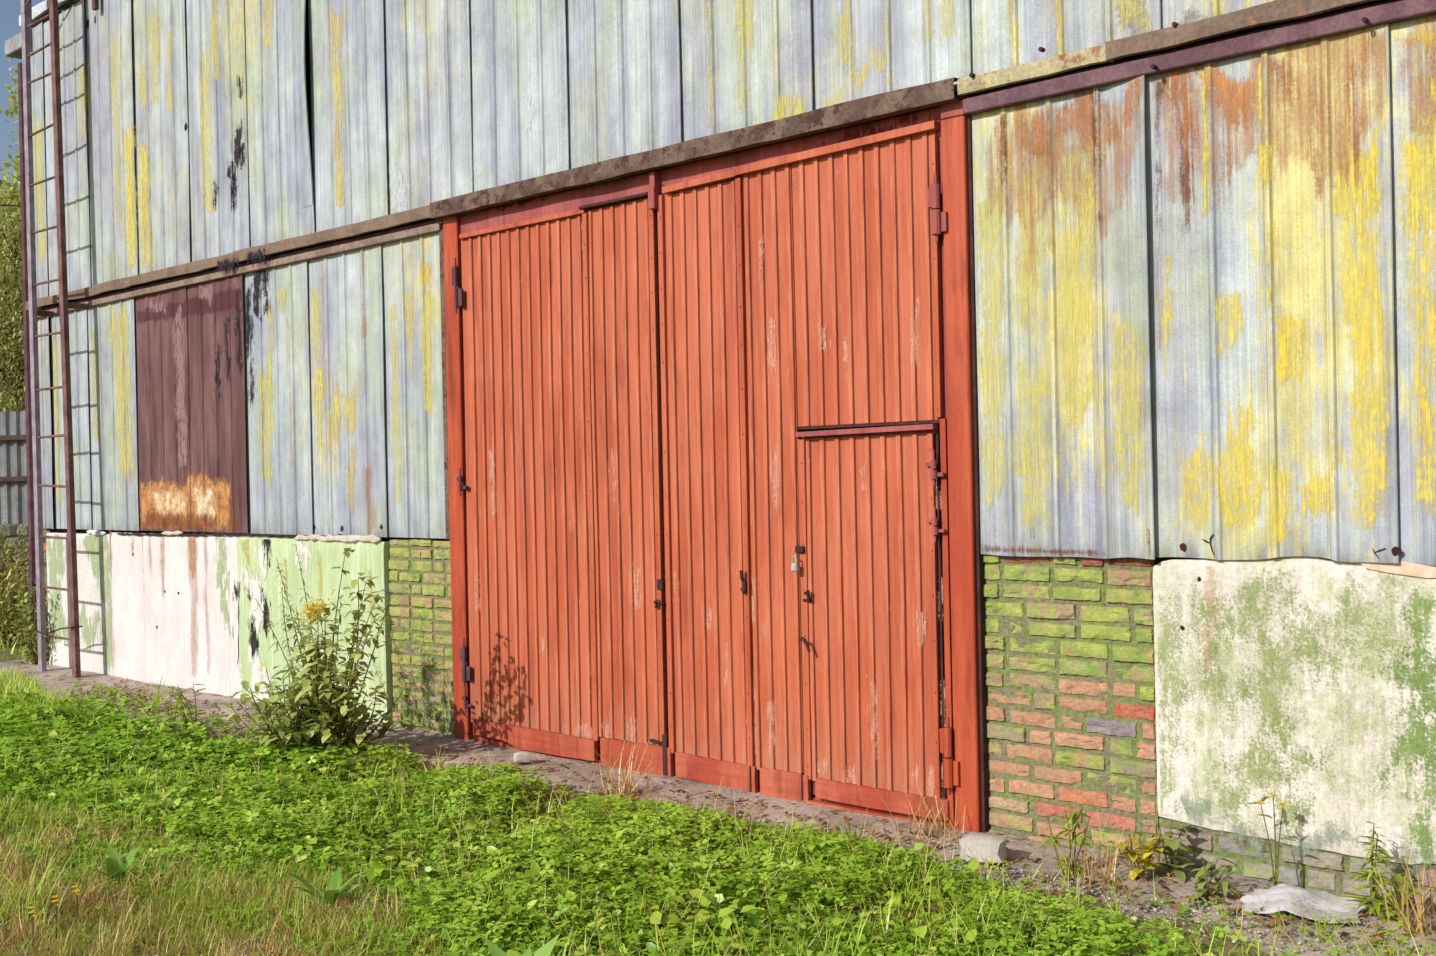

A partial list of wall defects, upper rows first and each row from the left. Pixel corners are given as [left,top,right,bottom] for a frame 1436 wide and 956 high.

corrosion [989,32,1386,233]
peeling [46,534,112,674]
corrosion [140,455,238,579]
peeling [210,538,276,702]
peeling [294,541,312,581]
leakage [1181,792,1433,868]